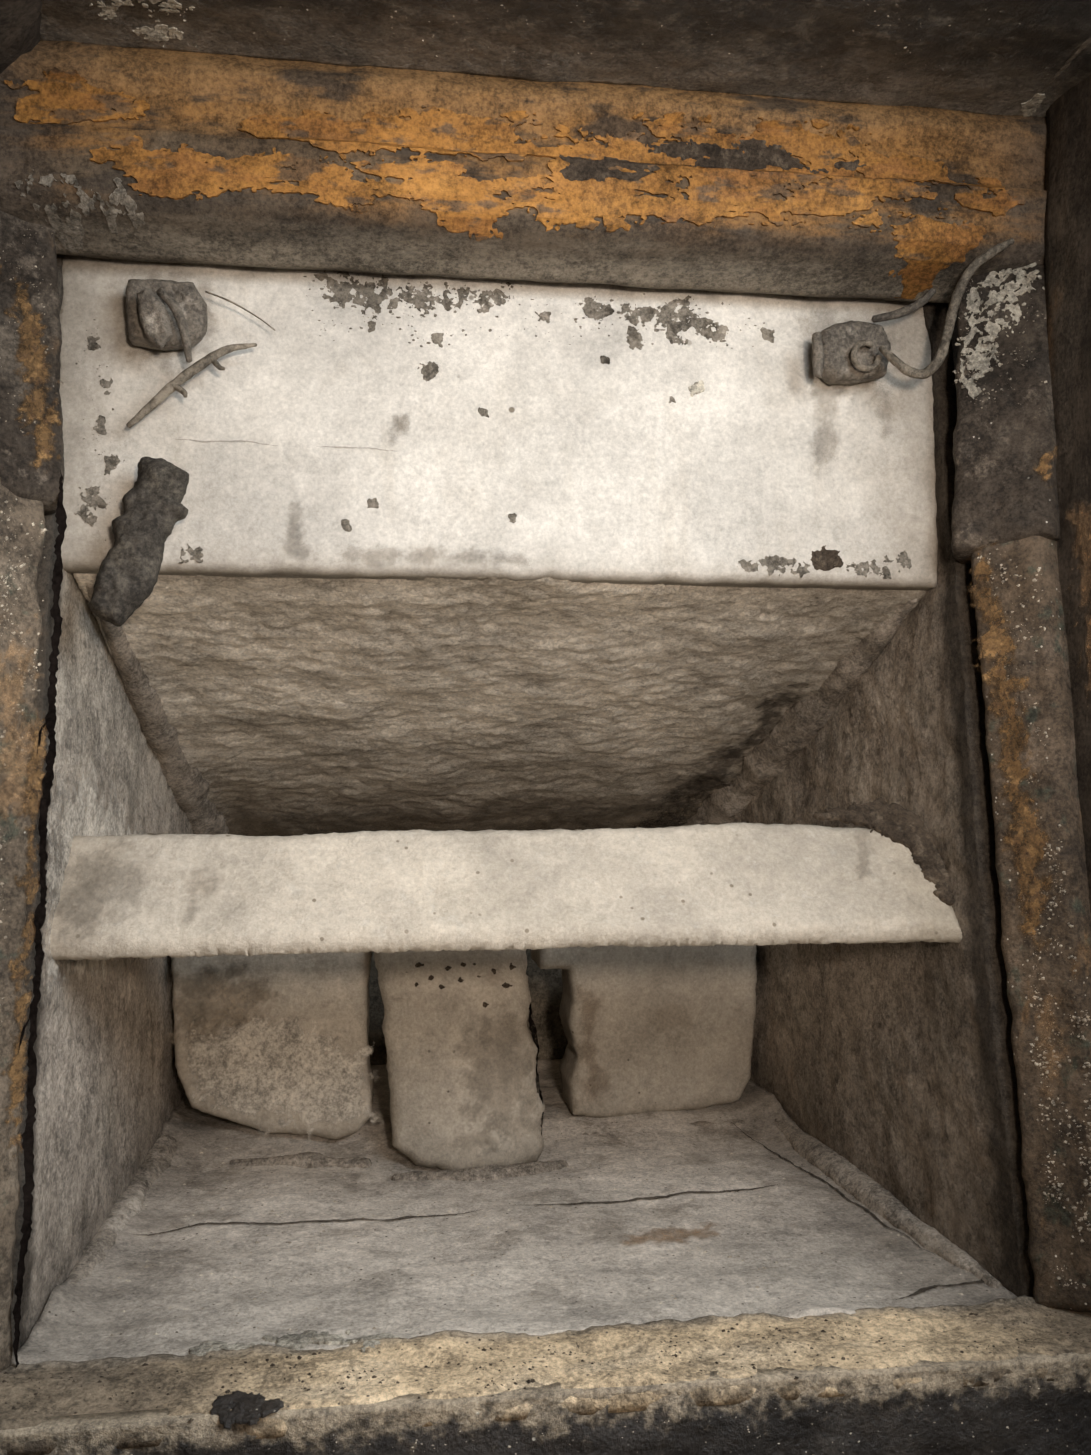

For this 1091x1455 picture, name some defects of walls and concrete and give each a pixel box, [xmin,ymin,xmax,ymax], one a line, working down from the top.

spalling [303,271,775,382]
spalling [341,519,352,532]
spalling [367,498,379,509]
spalling [737,545,912,579]
corrosion [969,542,1052,951]
spalling [813,797,954,906]
crack [12,470,67,1369]
crack [134,1123,992,1300]